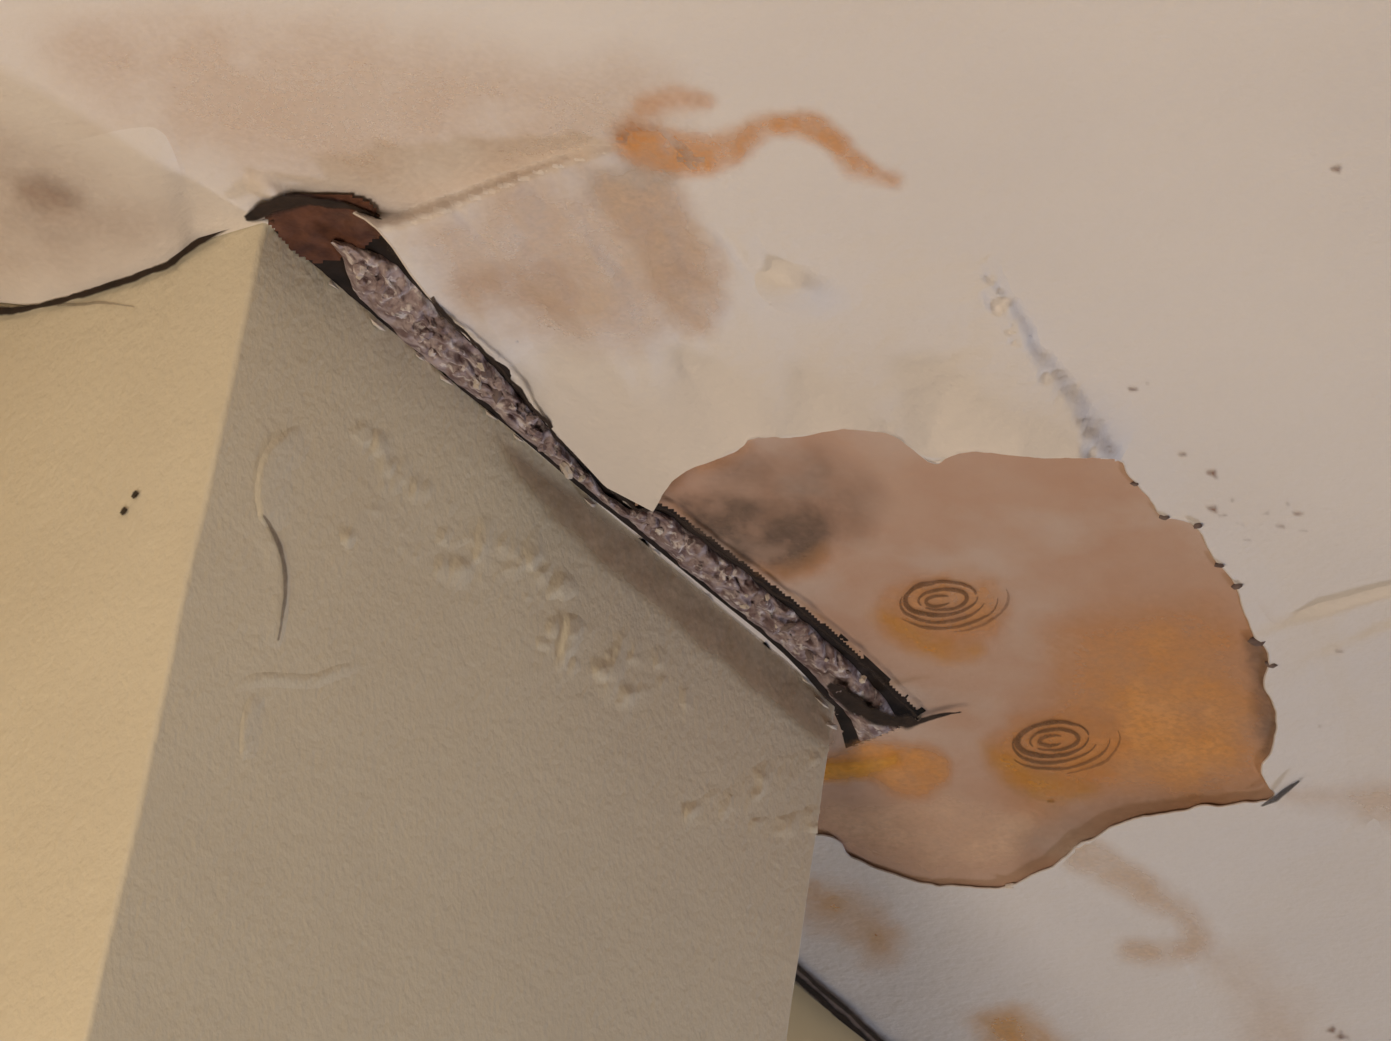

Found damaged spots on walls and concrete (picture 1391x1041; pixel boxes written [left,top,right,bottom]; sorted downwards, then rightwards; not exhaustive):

crack [0,194,961,748]
water stain [764,518,823,565]
corrosion [824,743,949,794]
peeling [498,303,1363,1041]
corrosion [1052,619,1260,793]